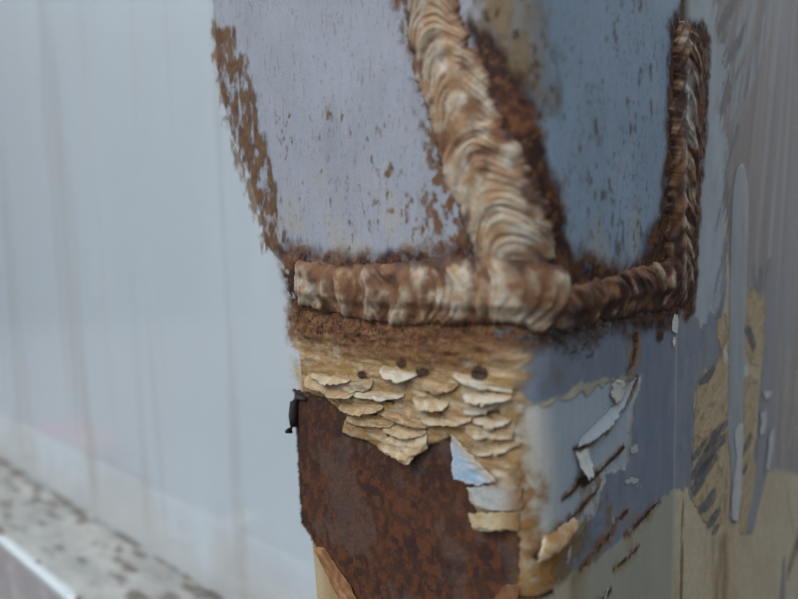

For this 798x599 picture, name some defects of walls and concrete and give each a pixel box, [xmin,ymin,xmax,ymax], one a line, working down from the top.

corrosion [211,0,711,369]
peeling [291,327,538,480]
corrosion [293,389,572,599]
peeling [582,472,606,518]
peeling [547,310,678,358]
peeling [691,285,775,535]